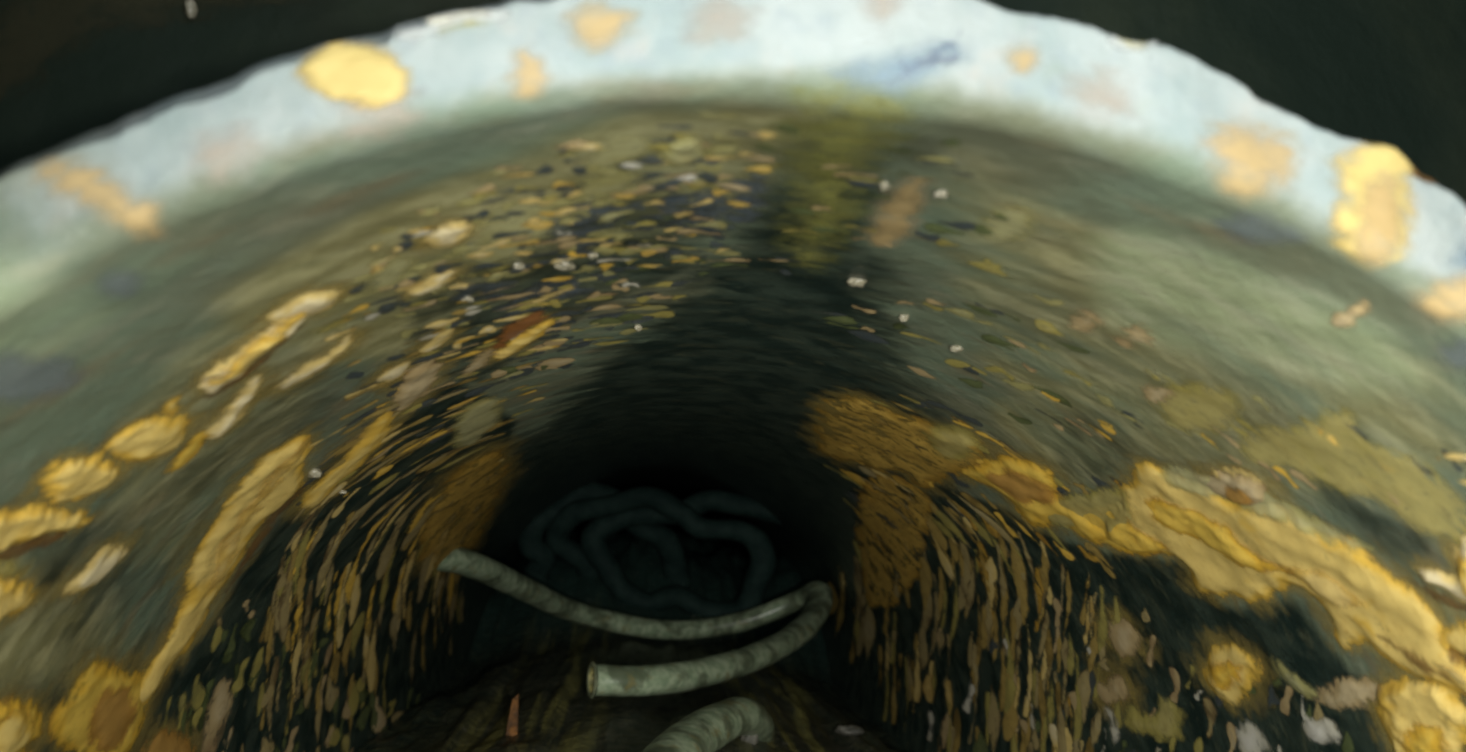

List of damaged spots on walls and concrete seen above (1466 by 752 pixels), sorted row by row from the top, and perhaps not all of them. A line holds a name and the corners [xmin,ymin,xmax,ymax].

rust [296,43,407,108]
rust [1334,145,1434,262]
rust [1421,279,1466,319]
rust [811,370,1466,752]